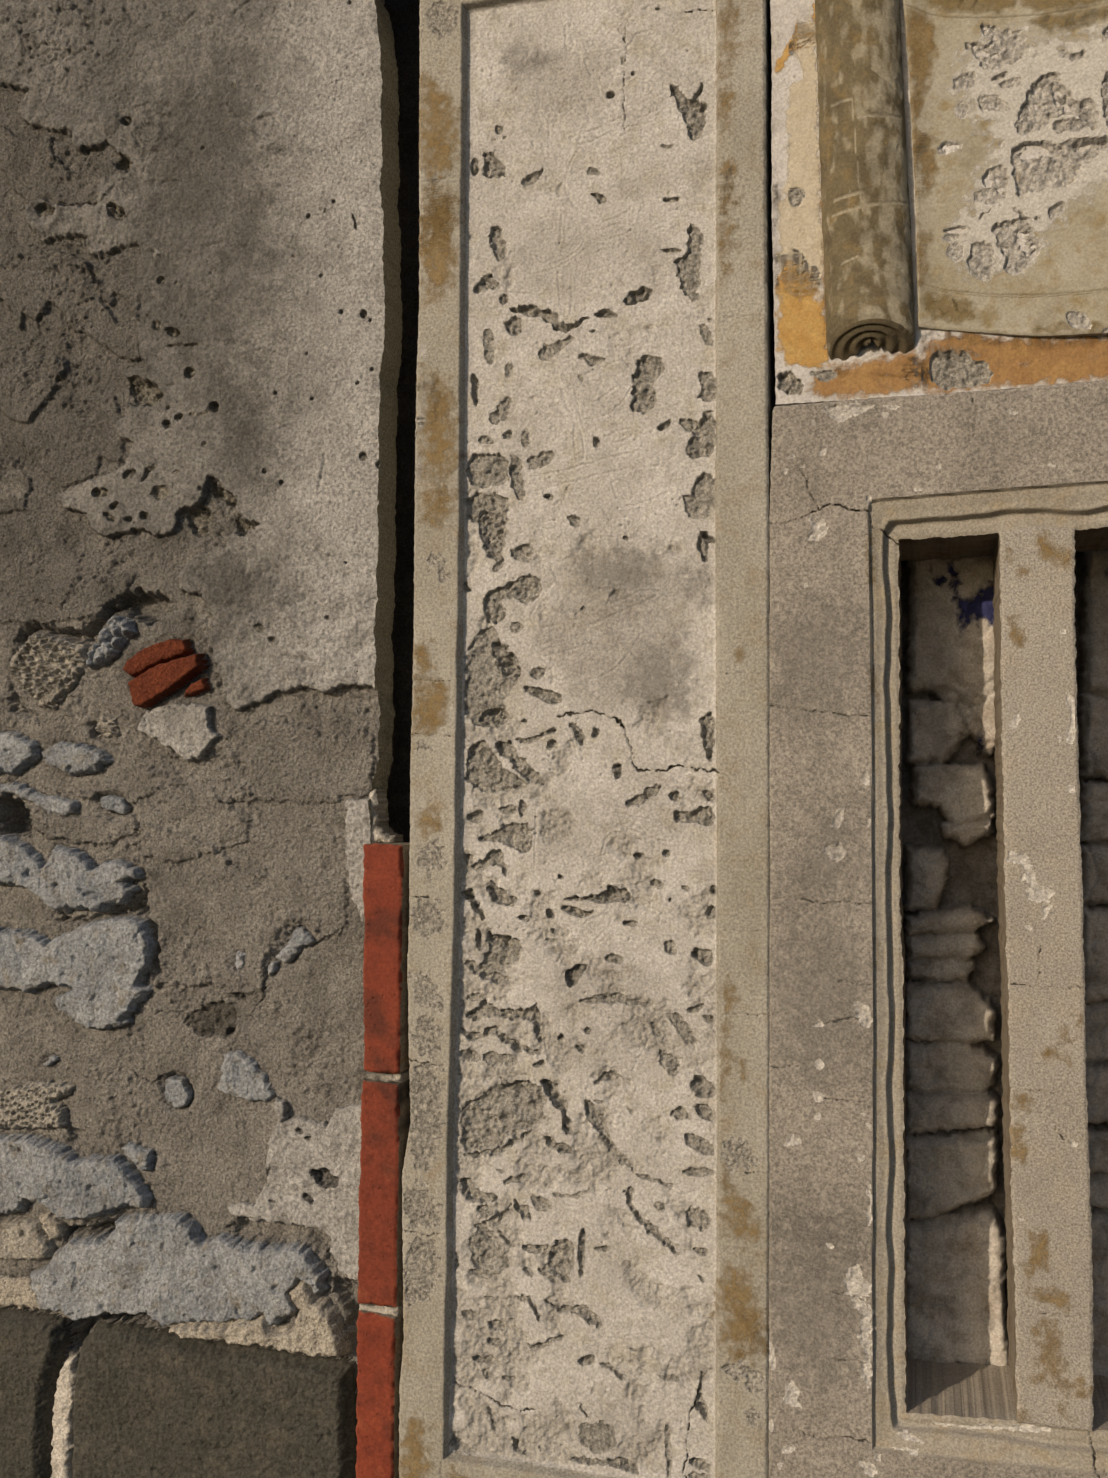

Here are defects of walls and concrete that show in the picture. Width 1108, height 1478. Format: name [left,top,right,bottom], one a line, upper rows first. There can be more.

damp [419,76,457,292]
peeling [775,3,824,301]
peeling [930,0,1108,281]
spalling [777,370,837,395]
damp [415,378,456,525]
crack [771,475,900,551]
crack [557,710,720,773]
spalling [183,992,246,1039]
spalling [302,1167,339,1205]
damp [1029,1233,1048,1274]
damp [717,1268,766,1358]
spalling [843,1263,877,1389]